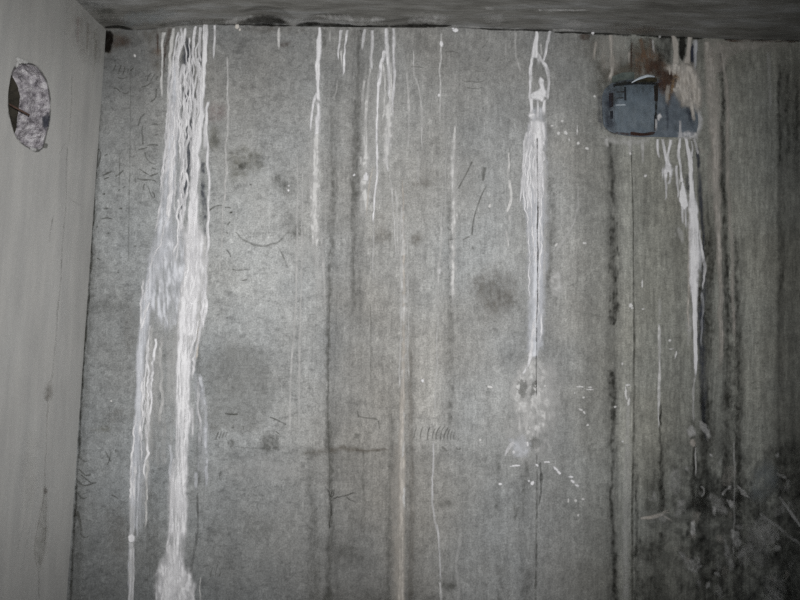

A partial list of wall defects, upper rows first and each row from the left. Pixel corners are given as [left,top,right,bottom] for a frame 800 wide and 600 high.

water stain [128,24,216,600]
efflorescence [297,17,353,247]
efflorescence [360,18,396,220]
efflorescence [505,29,573,457]
water stain [656,36,769,437]